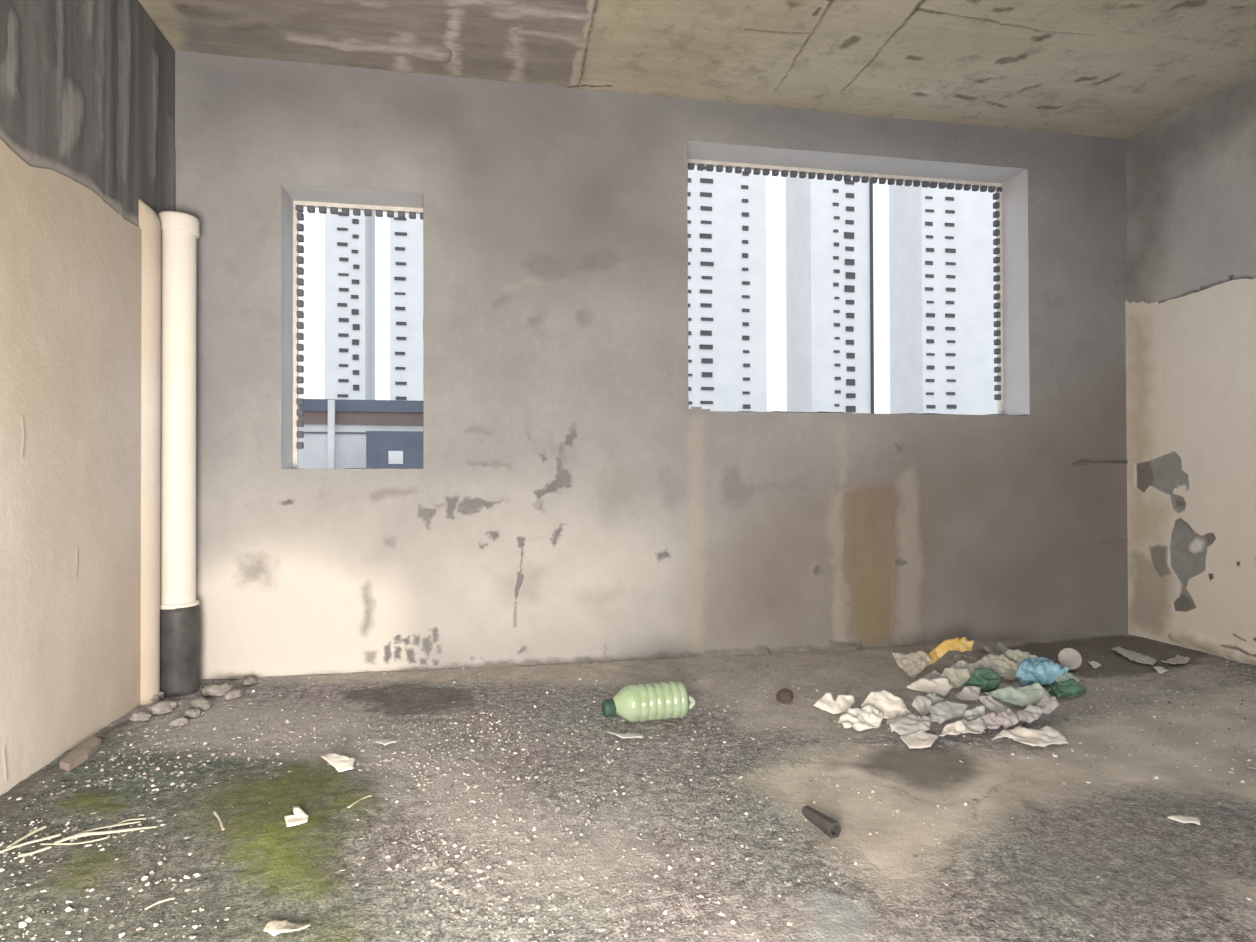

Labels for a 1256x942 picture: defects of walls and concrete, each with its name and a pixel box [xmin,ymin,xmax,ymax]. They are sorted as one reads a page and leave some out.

crack [740,0,838,95]
crack [836,0,1102,95]
peeling [0,0,176,227]
spalling [414,491,512,554]
spalling [528,419,584,554]
spalling [651,545,675,567]
peeling [1136,452,1216,612]
peeling [359,623,447,669]